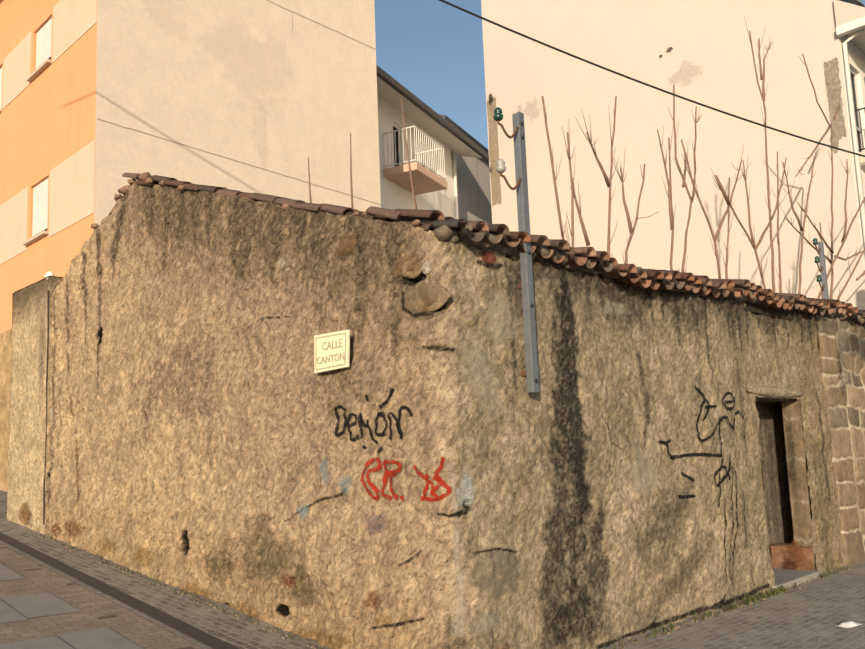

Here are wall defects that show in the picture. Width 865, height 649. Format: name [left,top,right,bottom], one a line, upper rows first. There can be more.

spalling [824,58,846,154]
spalling [393,254,453,319]
water stain [505,262,523,389]
water stain [533,258,819,649]